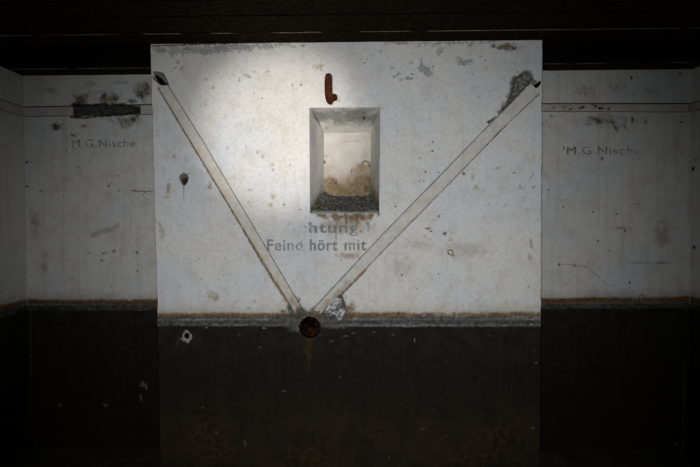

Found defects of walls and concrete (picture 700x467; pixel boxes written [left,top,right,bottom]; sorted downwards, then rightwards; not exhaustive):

rust [158,88,300,315]
rust [340,94,539,295]
spalling [487,71,537,124]
spalling [322,294,354,325]